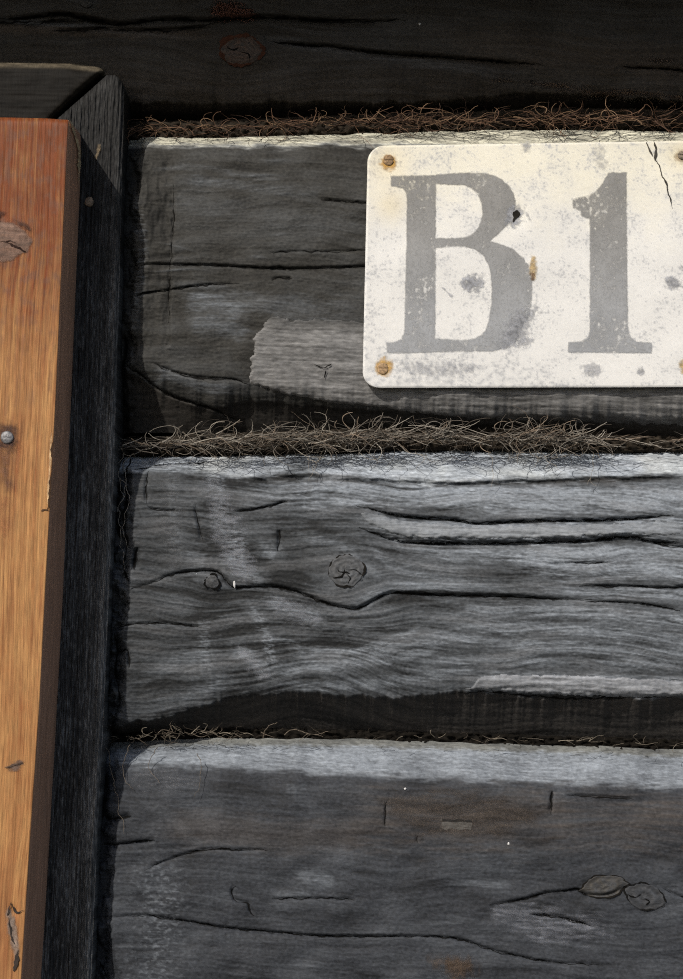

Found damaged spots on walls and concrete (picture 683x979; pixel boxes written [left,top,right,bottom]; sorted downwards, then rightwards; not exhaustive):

crack [646,141,672,206]
crack [117,458,683,610]
crack [102,773,131,820]
crack [106,840,264,868]
crack [102,886,609,965]